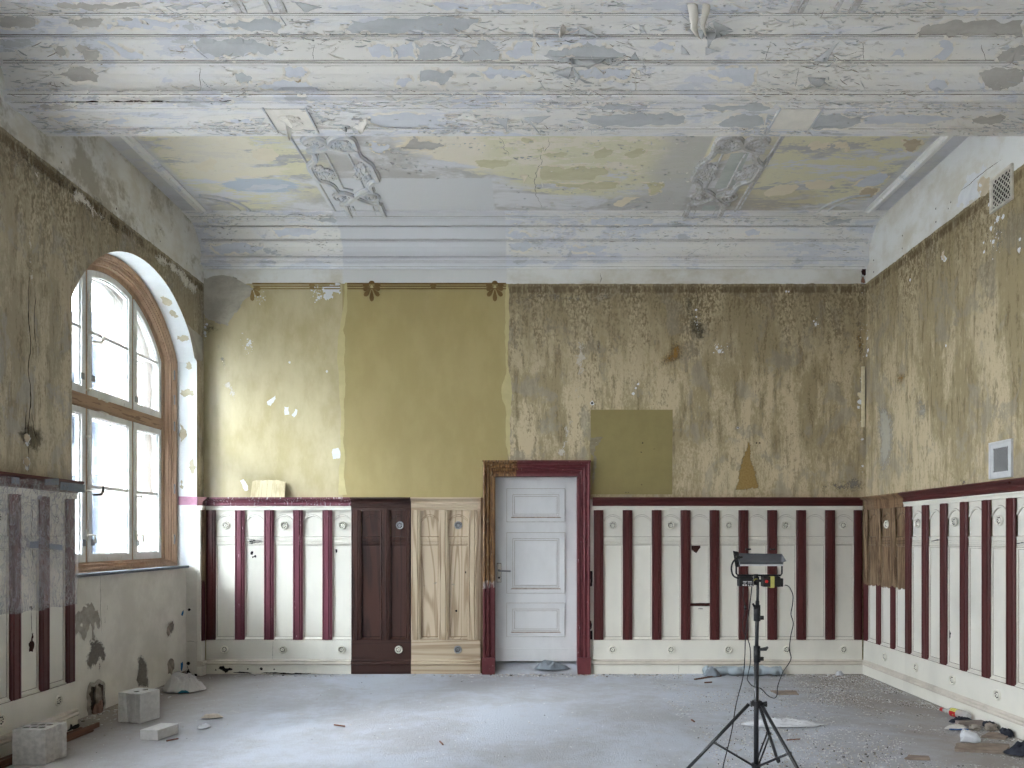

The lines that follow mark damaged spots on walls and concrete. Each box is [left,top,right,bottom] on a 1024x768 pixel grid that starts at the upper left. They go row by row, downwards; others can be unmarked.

peeling [0,1,1024,283]
peeling [160,296,208,369]
damp [20,426,41,450]
damp [735,442,758,490]
flaking render [75,601,101,643]
spalling [67,679,106,731]